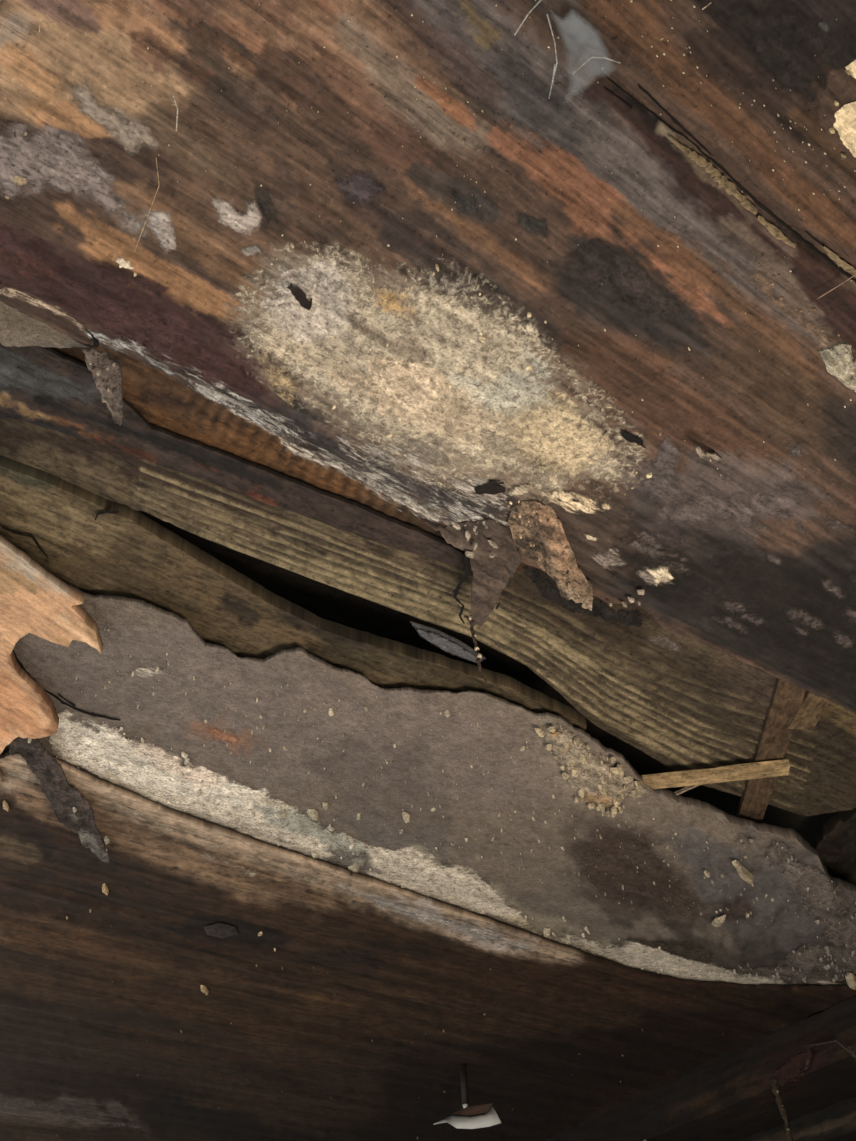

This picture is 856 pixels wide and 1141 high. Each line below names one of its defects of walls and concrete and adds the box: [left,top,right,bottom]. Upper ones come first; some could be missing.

damp [72,86,158,153]
damp [0,124,176,249]
crack [602,71,856,283]
spalling [286,283,313,310]
peeling [82,346,123,426]
damp [0,187,856,683]
spalling [621,432,646,449]
spalling [474,481,505,495]
peeling [421,499,593,626]
peeling [609,590,645,608]
spalling [9,709,856,990]